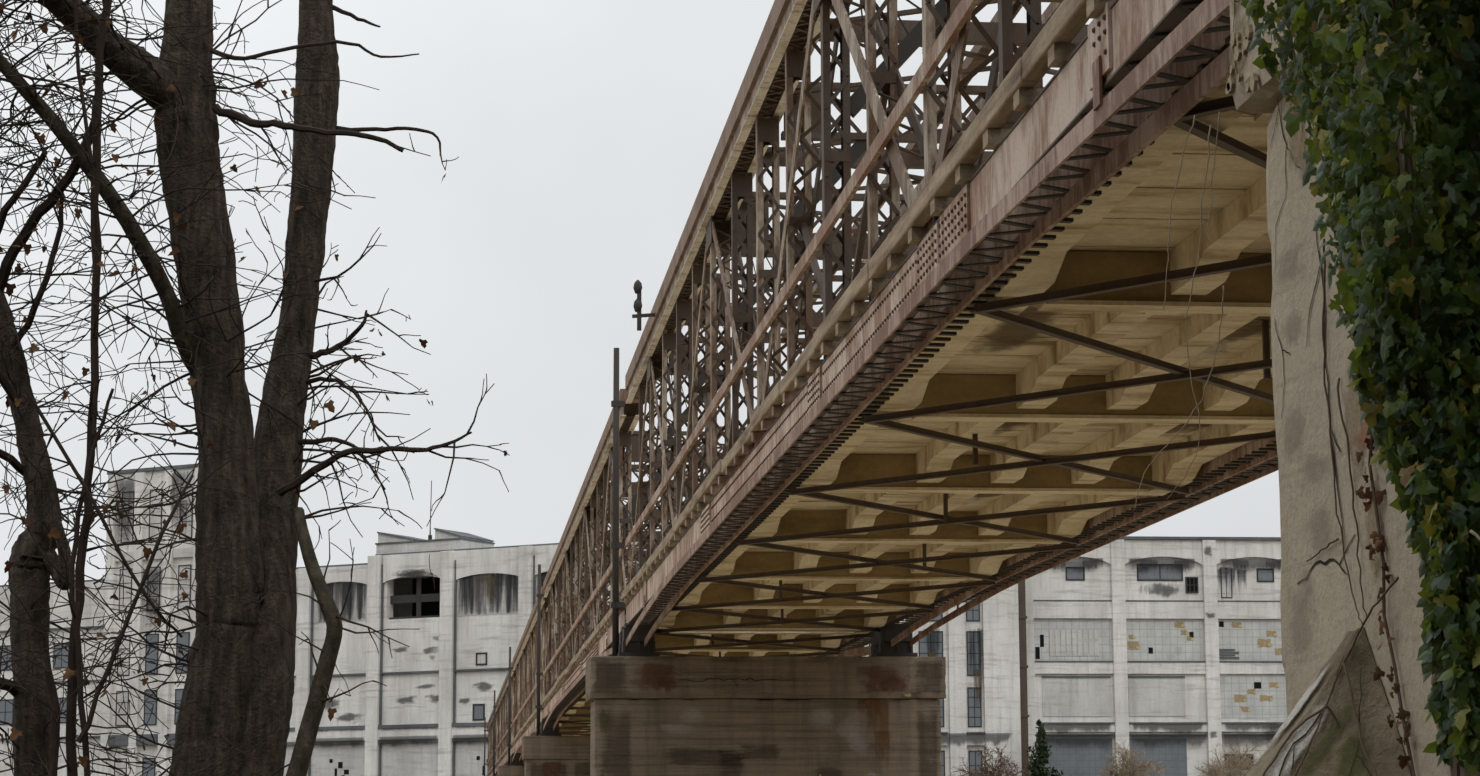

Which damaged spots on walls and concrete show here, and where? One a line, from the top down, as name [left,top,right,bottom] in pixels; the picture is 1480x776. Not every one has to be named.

crack [1270,96,1302,273]
crack [1274,220,1355,585]
rust [858,667,905,749]